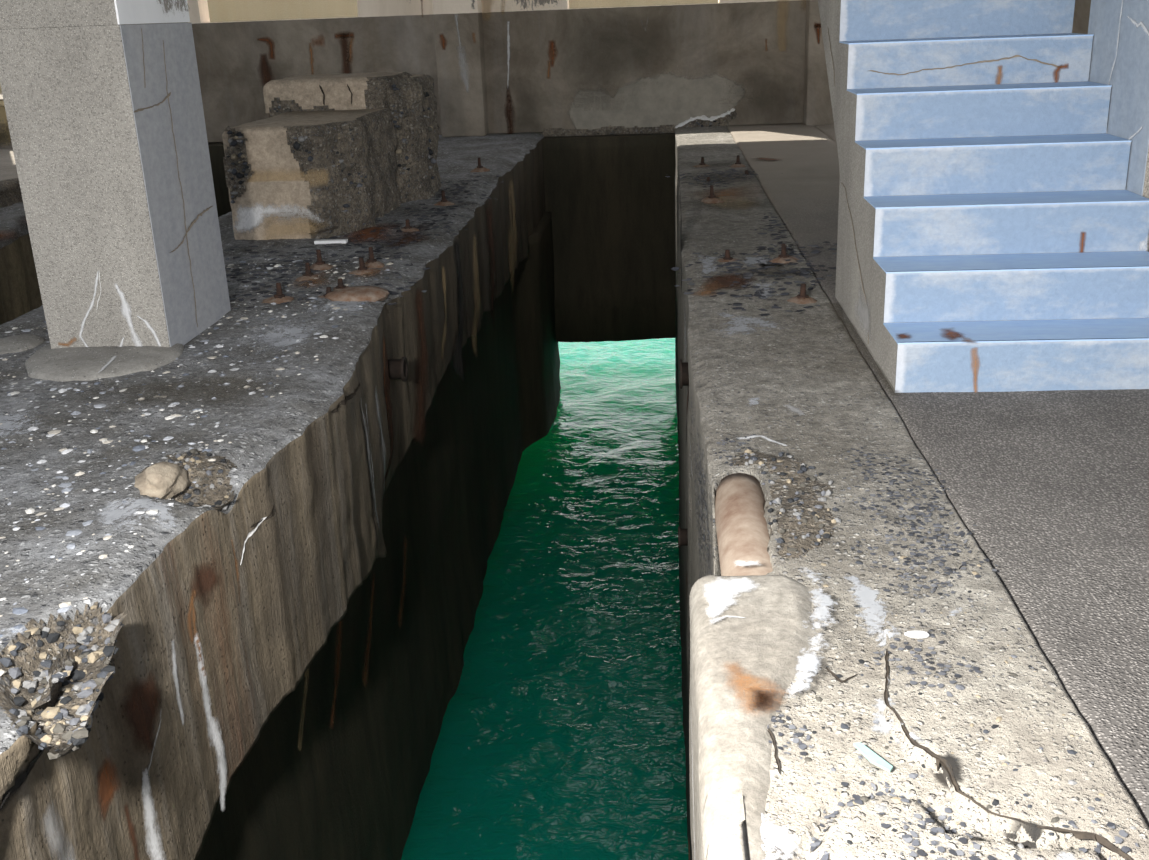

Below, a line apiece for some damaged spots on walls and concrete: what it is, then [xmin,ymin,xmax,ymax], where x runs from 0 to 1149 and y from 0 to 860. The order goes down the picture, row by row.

corrosion [258,38,274,85]
corrosion [309,33,354,75]
spalling [543,72,744,137]
crack [869,55,1059,75]
crack [134,28,213,327]
leakage [98,284,161,373]
corrosion [945,330,978,392]
spalling [165,447,237,511]
spalling [0,602,127,810]
efflorescence [191,598,226,810]
efflorescence [142,715,164,860]
crack [763,649,1139,860]